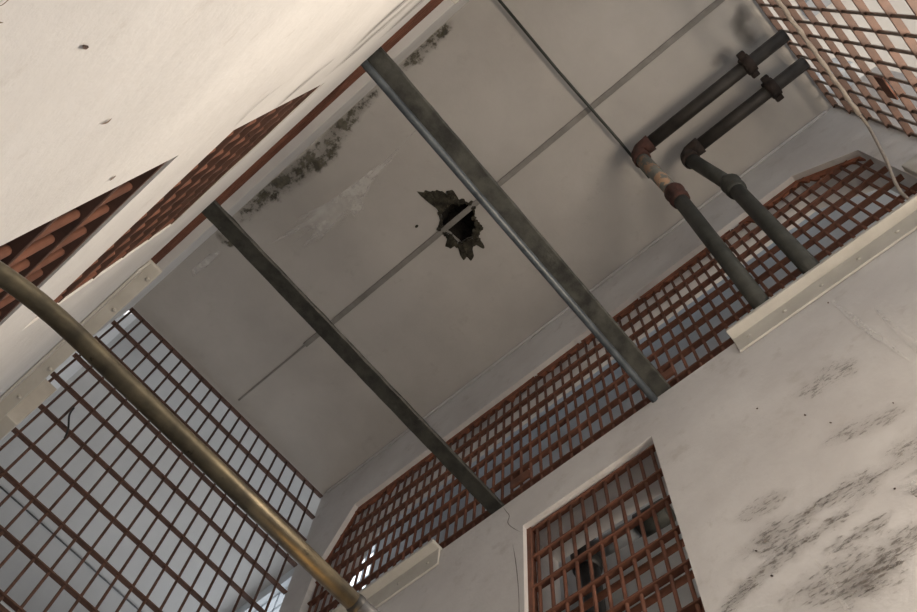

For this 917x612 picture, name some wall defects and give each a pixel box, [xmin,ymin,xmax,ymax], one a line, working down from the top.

leakage [404,24,449,67]
leakage [240,91,377,215]
peeling [437,190,466,253]
leakage [724,470,887,612]
leakage [788,513,917,609]